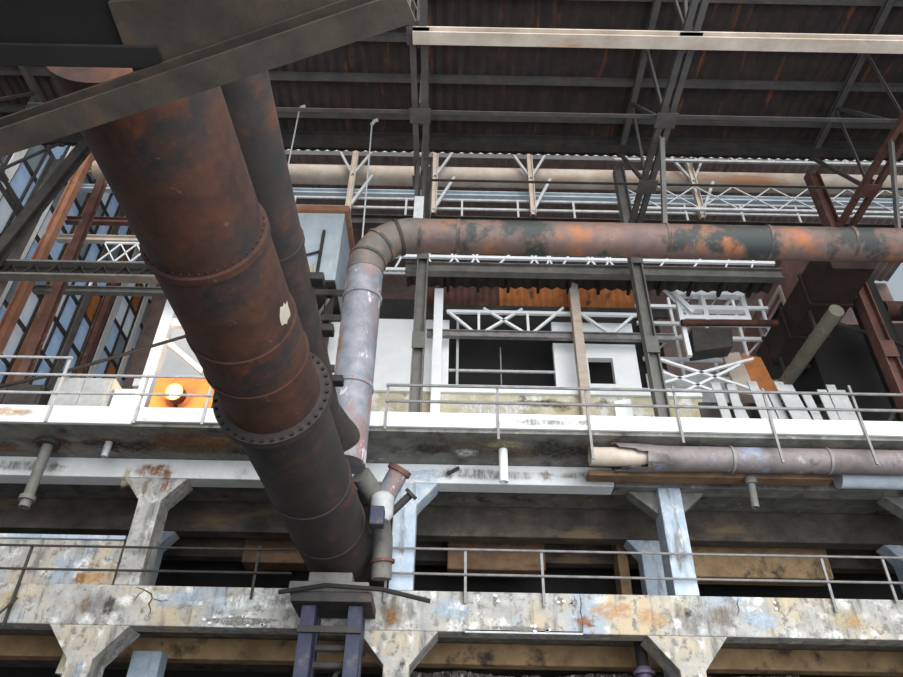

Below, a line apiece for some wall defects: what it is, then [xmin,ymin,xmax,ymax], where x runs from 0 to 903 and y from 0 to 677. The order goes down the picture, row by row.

corrosion [140,465,169,490]